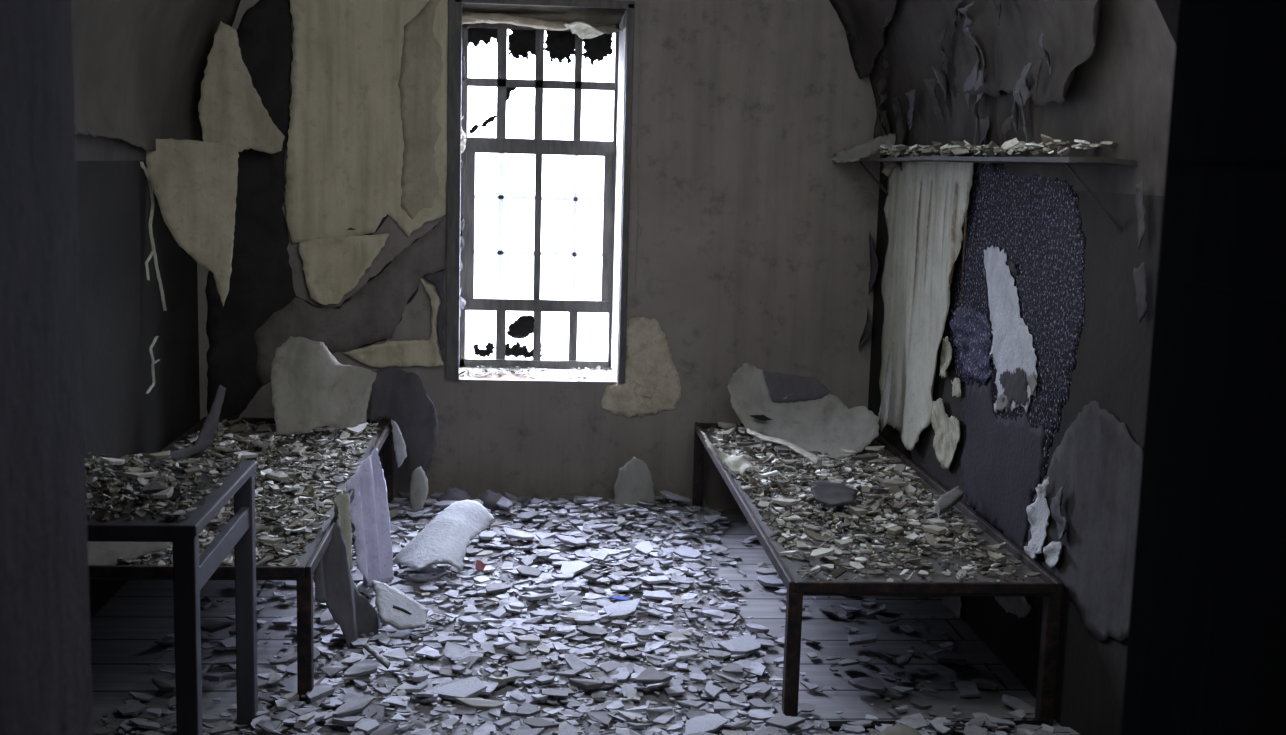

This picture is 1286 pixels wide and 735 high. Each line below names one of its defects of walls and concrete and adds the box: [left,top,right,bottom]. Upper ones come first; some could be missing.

peeling [71,0,623,417]
peeling [829,0,1100,469]